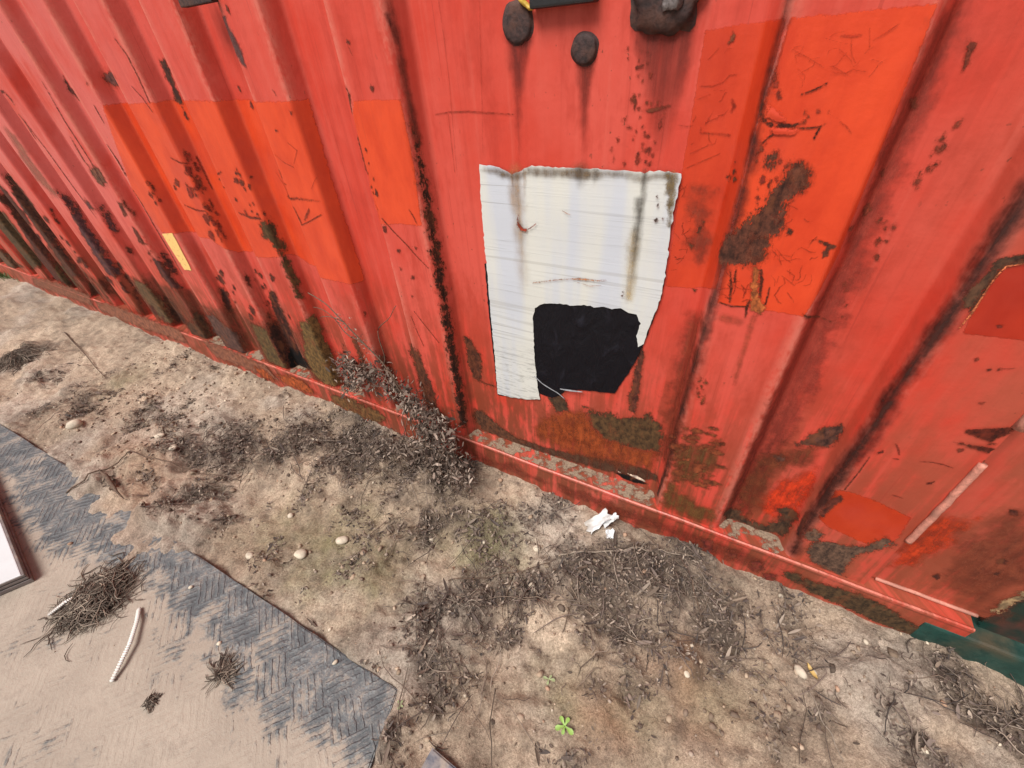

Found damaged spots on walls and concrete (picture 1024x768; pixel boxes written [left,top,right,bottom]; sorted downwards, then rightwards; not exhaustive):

corrosion [0,173,386,423]
corrosion [387,15,528,444]
corrosion [688,133,812,273]
corrosion [538,184,1024,635]
peeling [960,263,1023,328]